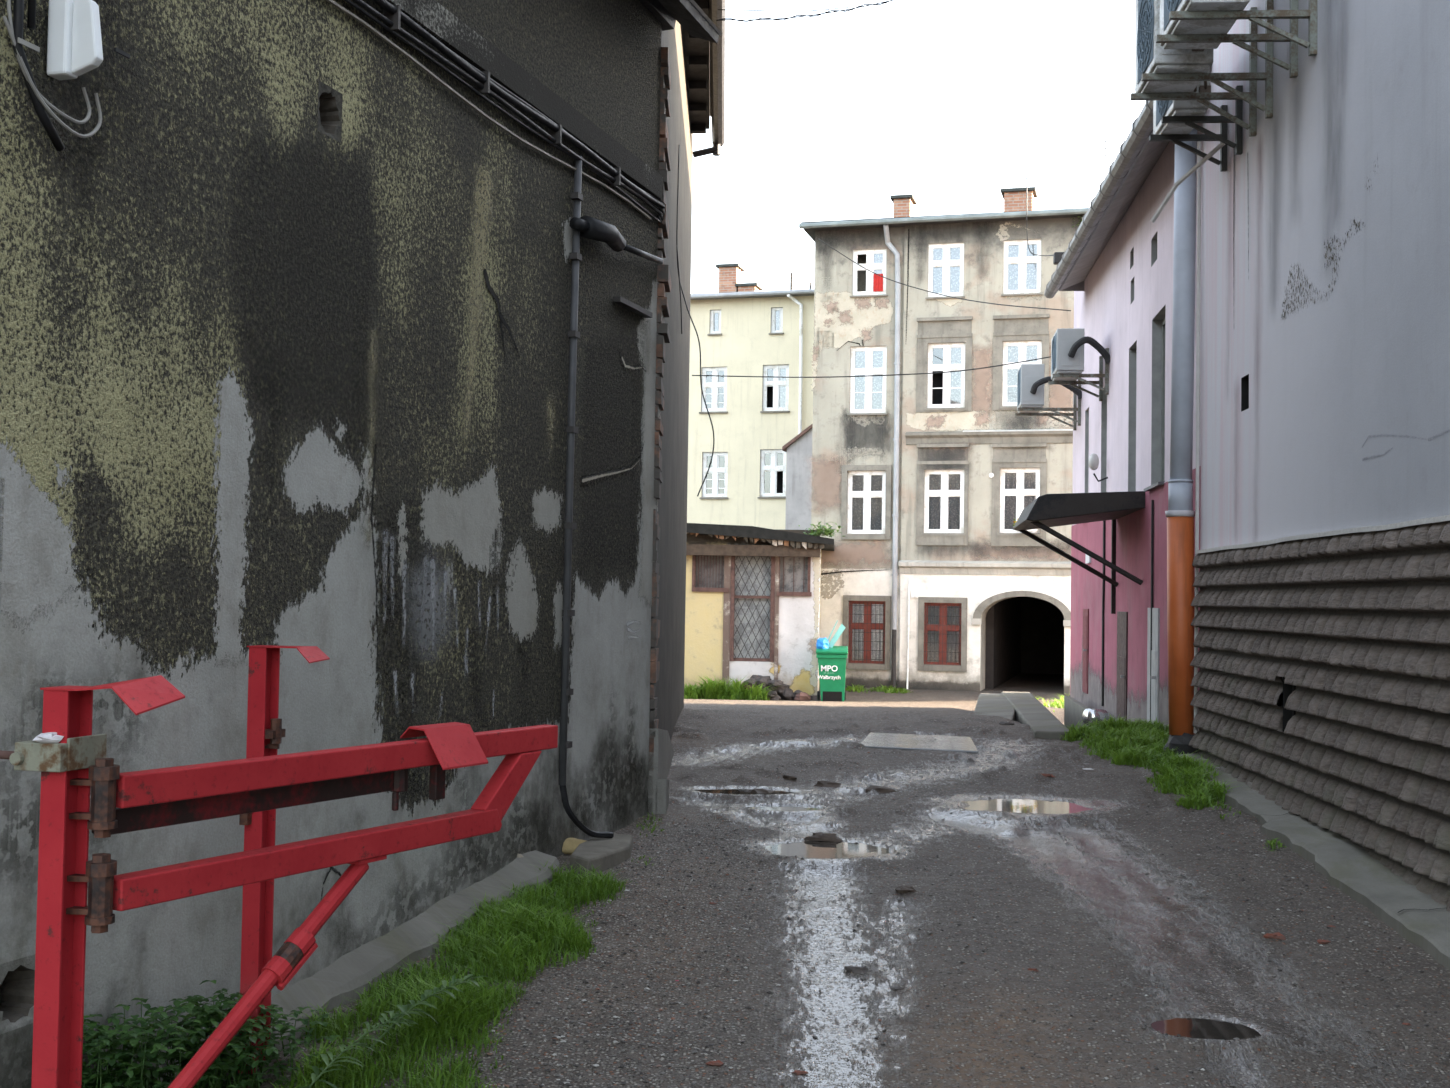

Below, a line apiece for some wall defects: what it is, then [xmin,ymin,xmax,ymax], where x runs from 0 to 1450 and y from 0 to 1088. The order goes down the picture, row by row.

water stain [466,170,491,425]
flaking render [811,291,894,390]
flaking render [1282,220,1360,318]
flaking render [0,436,83,634]
flaking render [210,365,257,669]
flaking render [281,417,370,539]
water stain [384,537,456,648]
flaking render [395,461,564,650]